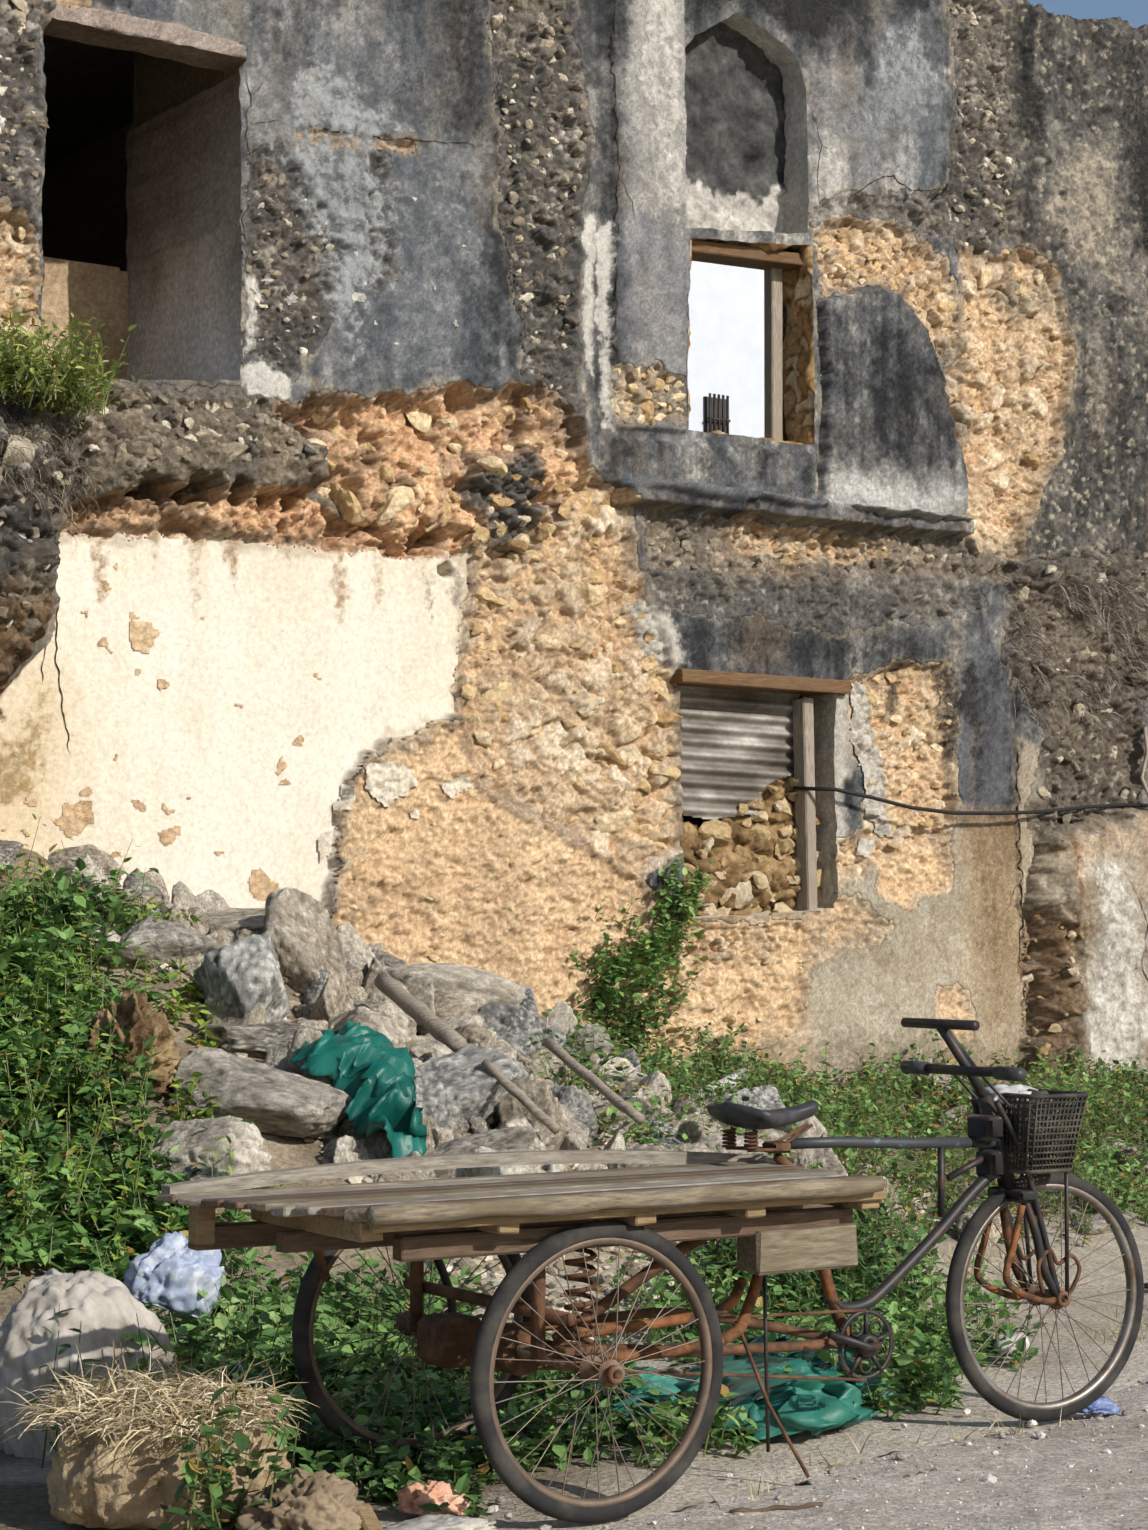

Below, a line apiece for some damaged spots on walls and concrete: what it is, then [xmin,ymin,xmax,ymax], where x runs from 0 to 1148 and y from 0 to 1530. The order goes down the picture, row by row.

water stain [275,0,293,32]
water stain [445,0,489,129]
water stain [257,49,414,366]
water stain [430,152,480,282]
water stain [1017,3,1148,294]
efflorescence [240,275,292,399]
efflorescence [580,214,619,432]
spalling [54,0,1148,1081]
crack [41,562,71,755]
efflorescence [625,599,685,667]
water stain [712,617,917,720]